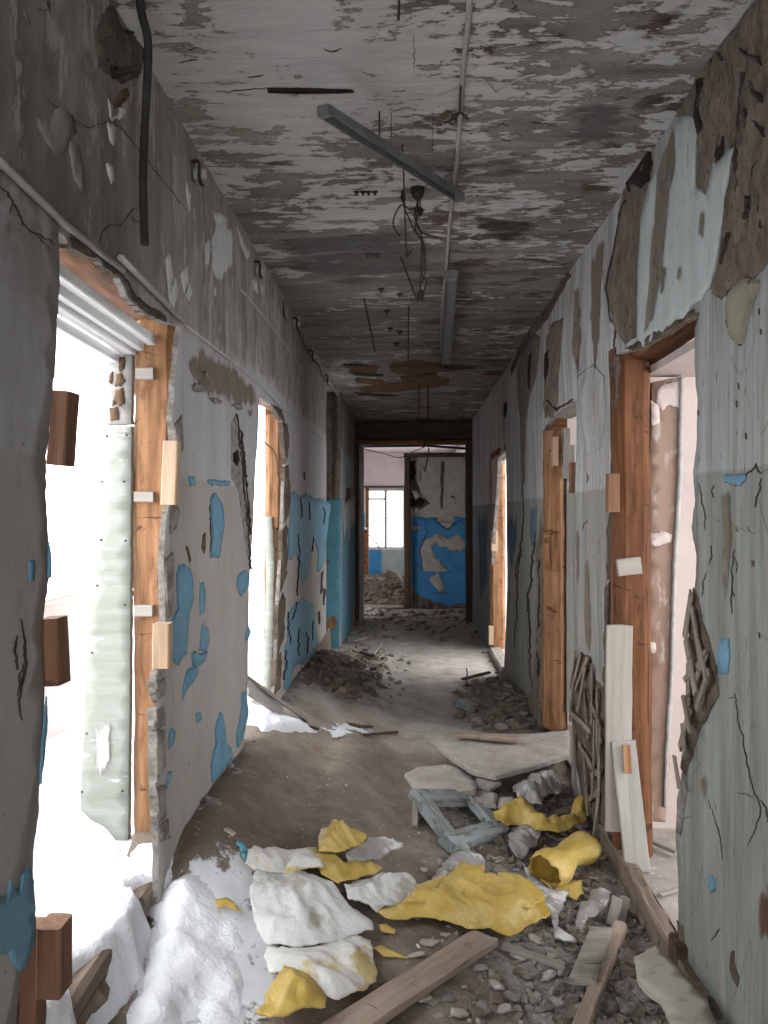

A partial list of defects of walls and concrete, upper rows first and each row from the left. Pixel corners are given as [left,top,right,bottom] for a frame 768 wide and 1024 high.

flaking render [95,6,144,146]
crack [0,186,56,250]
flaking render [59,236,189,322]
flaking render [596,0,768,415]
flaking render [517,317,574,485]
peeling [650,381,680,425]
flaking render [147,370,253,841]
peeling [267,404,355,694]
peeling [412,515,466,609]
flaking render [602,512,611,759]
crack [698,463,768,613]
crack [727,694,768,847]